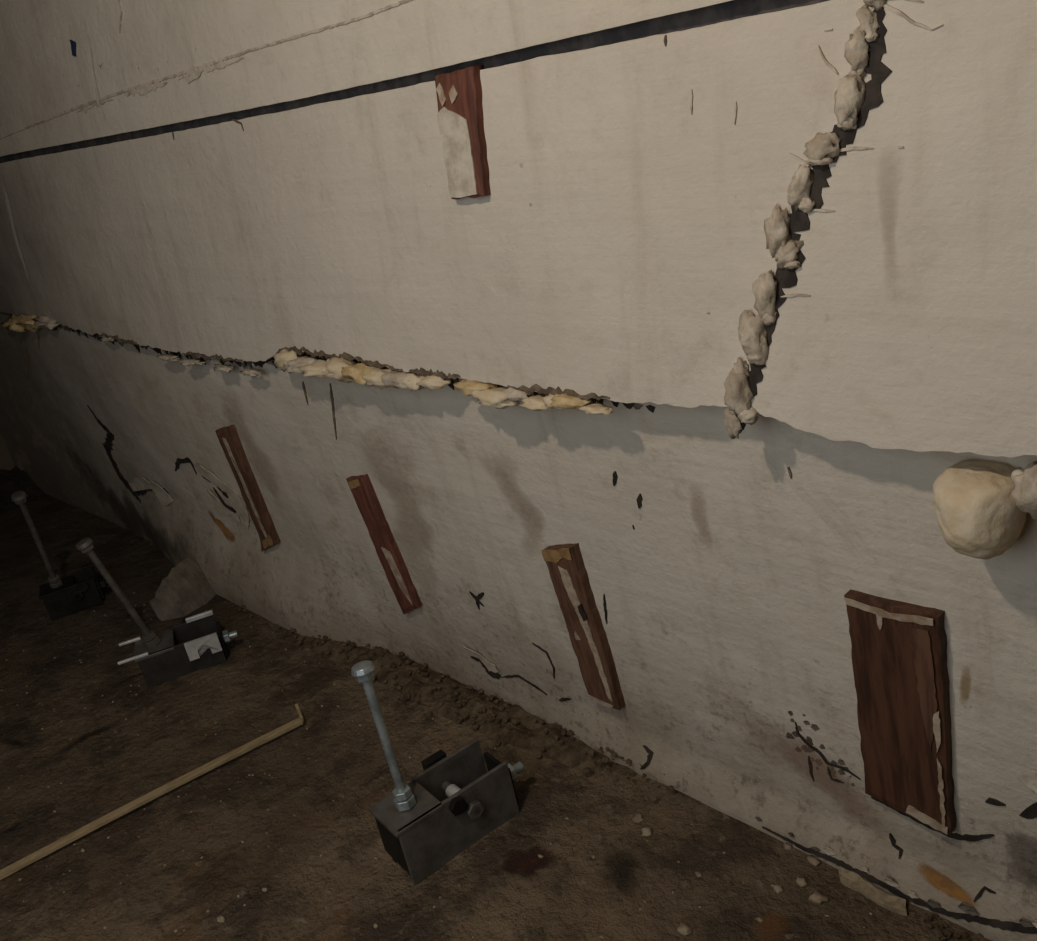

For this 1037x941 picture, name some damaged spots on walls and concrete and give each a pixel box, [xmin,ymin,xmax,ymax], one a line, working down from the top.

crack [0,0,829,163]
crack [723,0,944,439]
crack [1,313,655,440]
crack [87,405,141,504]
crack [469,591,484,610]
crack [532,642,571,702]
crack [755,711,1037,934]